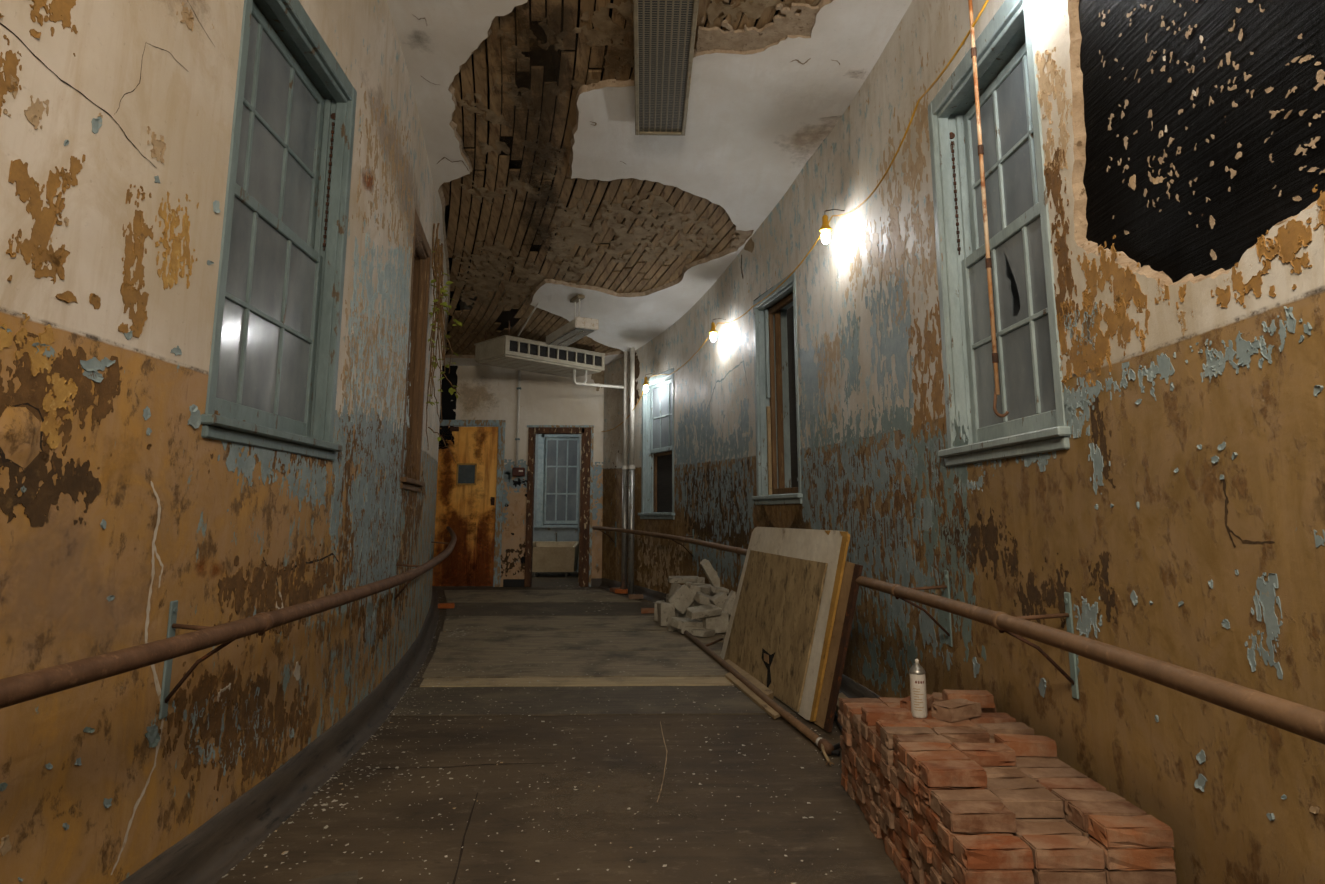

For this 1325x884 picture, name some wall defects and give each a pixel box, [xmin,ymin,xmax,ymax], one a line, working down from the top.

peeling [0,34,49,129]
peeling [29,0,78,38]
crack [0,23,182,159]
spalling [693,0,833,58]
peeling [6,140,101,309]
peeling [118,126,221,340]
spalling [438,0,754,449]
spalling [0,313,123,530]
peeling [145,84,426,802]
peeling [591,342,640,520]
peeling [634,398,755,593]
spalling [797,0,1325,698]